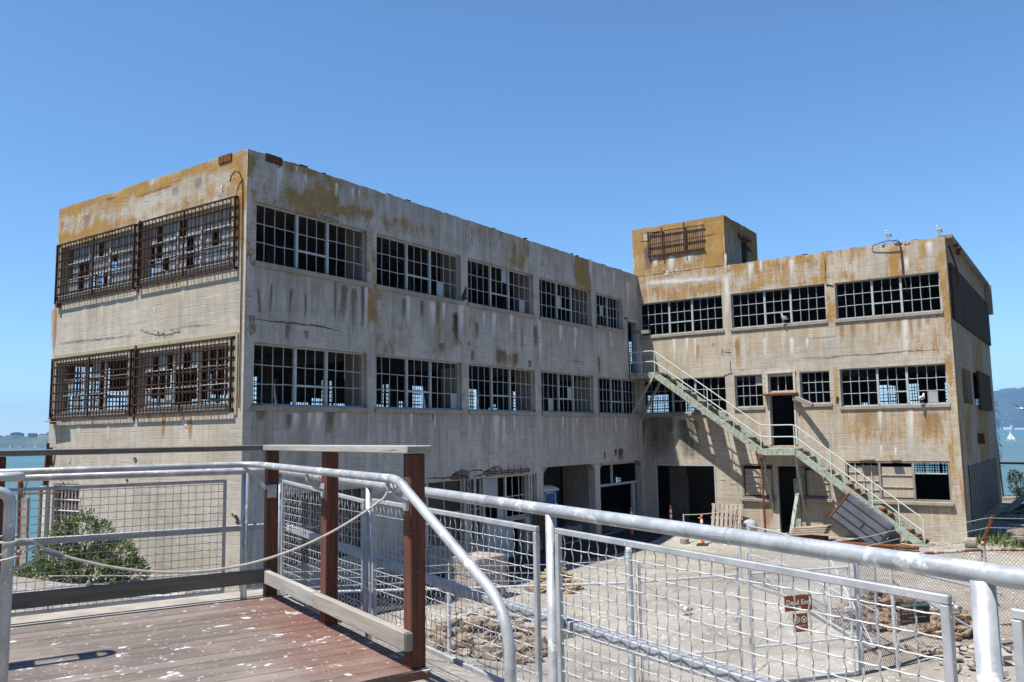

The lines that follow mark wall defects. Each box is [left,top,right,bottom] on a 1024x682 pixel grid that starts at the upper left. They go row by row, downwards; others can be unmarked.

water stain [645,247,730,318]
crack [247,296,340,331]
water stain [672,337,696,360]
water stain [902,319,910,357]
water stain [880,408,914,457]